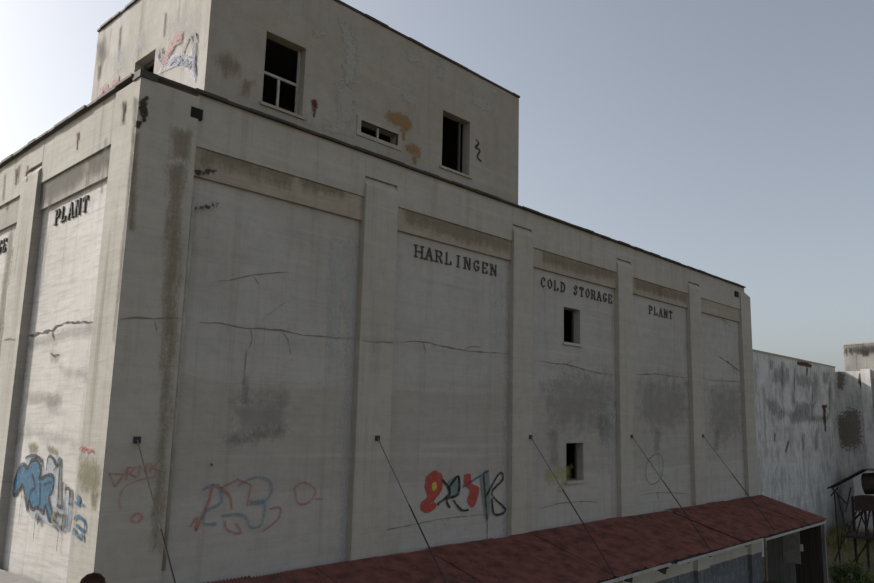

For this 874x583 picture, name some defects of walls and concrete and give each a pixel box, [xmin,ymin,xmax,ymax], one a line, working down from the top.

corrosion [388,112,420,164]
crack [4,321,92,357]
crack [120,317,181,331]
crack [202,302,505,384]